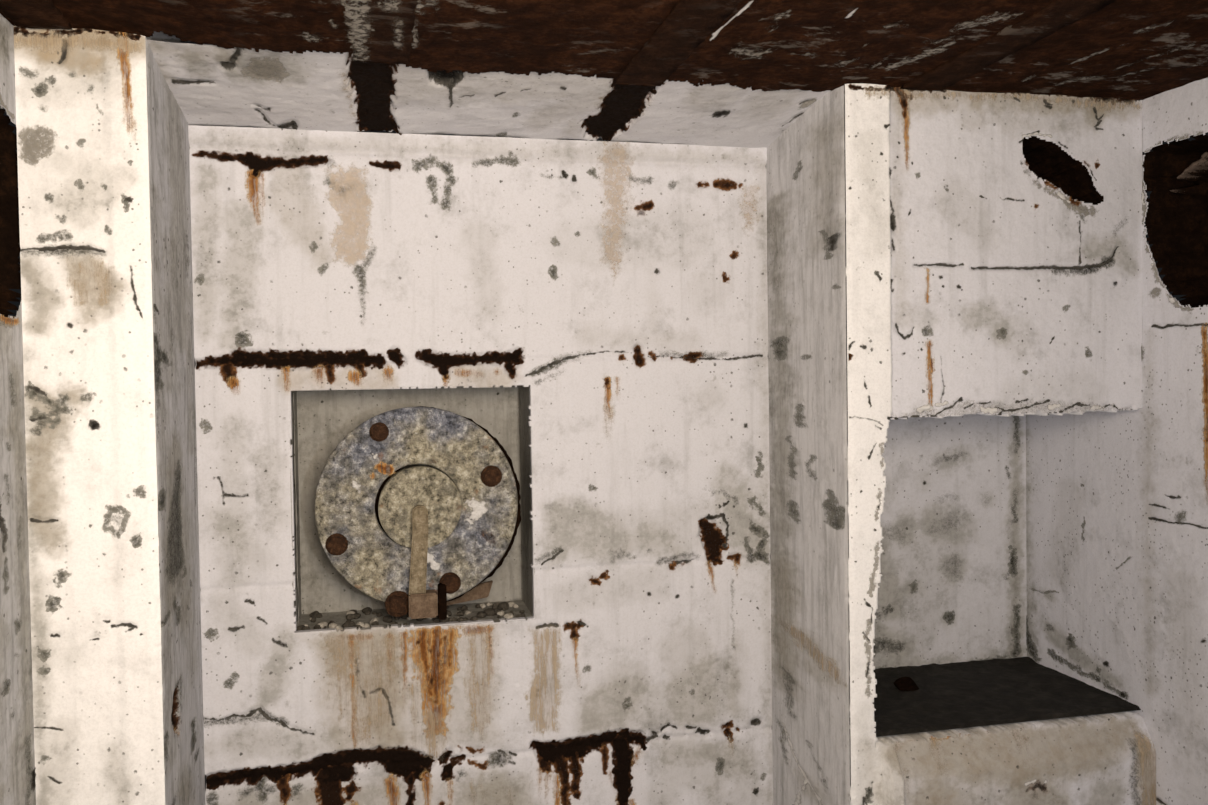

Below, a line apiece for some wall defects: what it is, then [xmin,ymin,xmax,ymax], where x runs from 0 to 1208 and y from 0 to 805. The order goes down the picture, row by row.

spalling [0,94,57,328]
rust [192,150,329,220]
crack [889,169,1118,292]
hole [1019,130,1104,220]
hole [1141,132,1208,311]
rust [196,347,524,390]
crack [895,323,914,340]
spalling [887,397,1133,420]
rust [727,553,741,583]
hole [171,678,182,731]
rust [206,626,466,805]
rust [530,728,647,805]